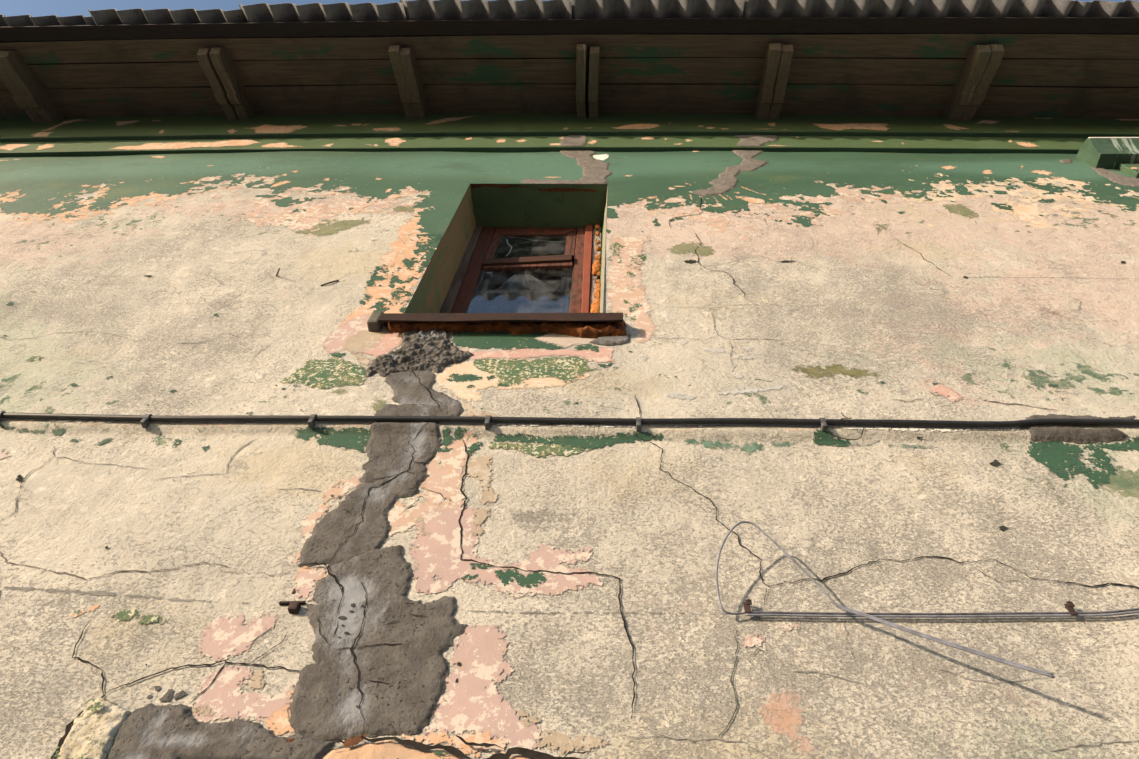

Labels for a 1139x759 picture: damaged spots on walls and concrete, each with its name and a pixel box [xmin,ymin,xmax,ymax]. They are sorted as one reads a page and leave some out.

peeling [112,120,307,158]
peeling [0,165,442,365]
crack [657,198,788,362]
peeling [619,165,1139,241]
crack [0,334,772,759]
peeling [384,333,618,598]
crack [634,394,1139,606]
peeling [192,613,295,736]
peeling [401,624,608,759]
crack [793,623,863,684]
crack [935,668,1048,683]
crack [1038,740,1139,753]